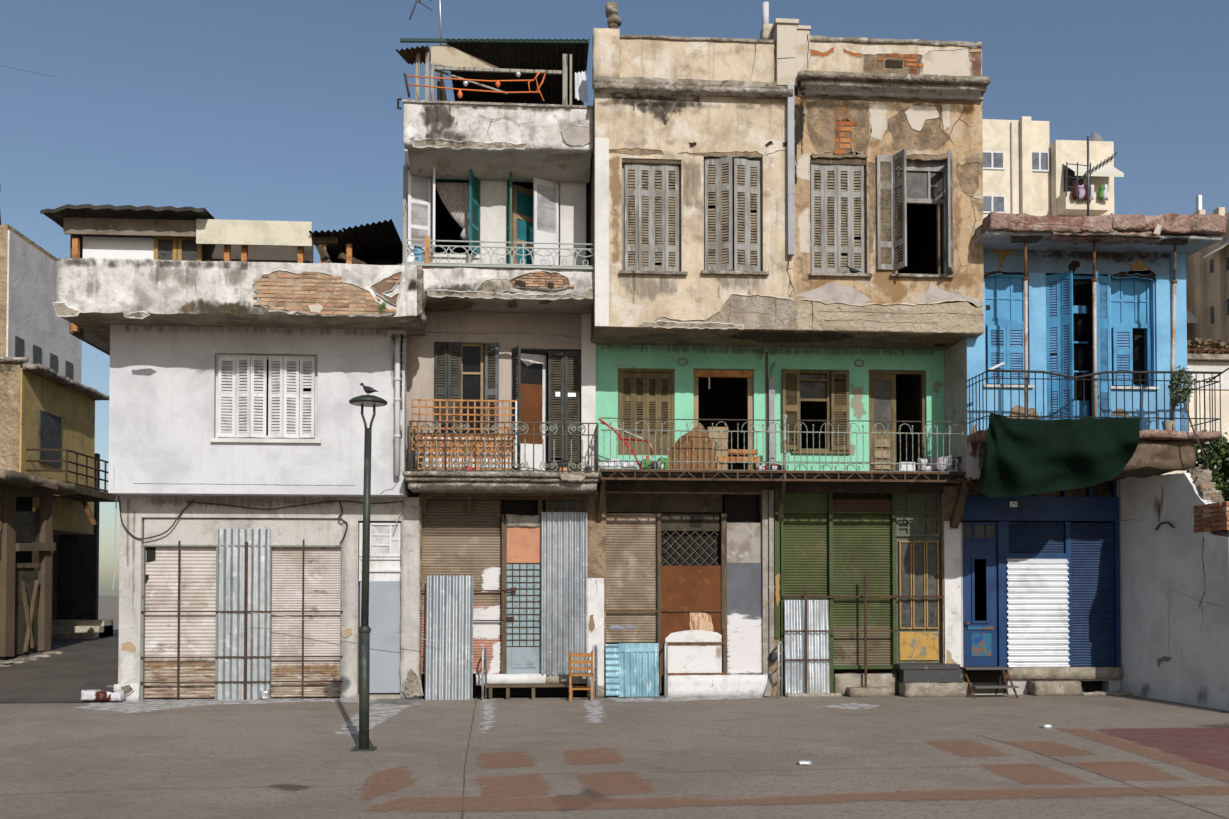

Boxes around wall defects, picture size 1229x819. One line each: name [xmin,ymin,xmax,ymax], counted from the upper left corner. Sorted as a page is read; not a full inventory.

peeling [810,47,982,76]
damp [601,89,724,125]
spalling [609,147,664,156]
spalling [680,97,983,254]
spalling [252,268,403,317]
spalling [425,271,594,312]
spalling [639,281,984,347]
peeling [851,387,866,419]